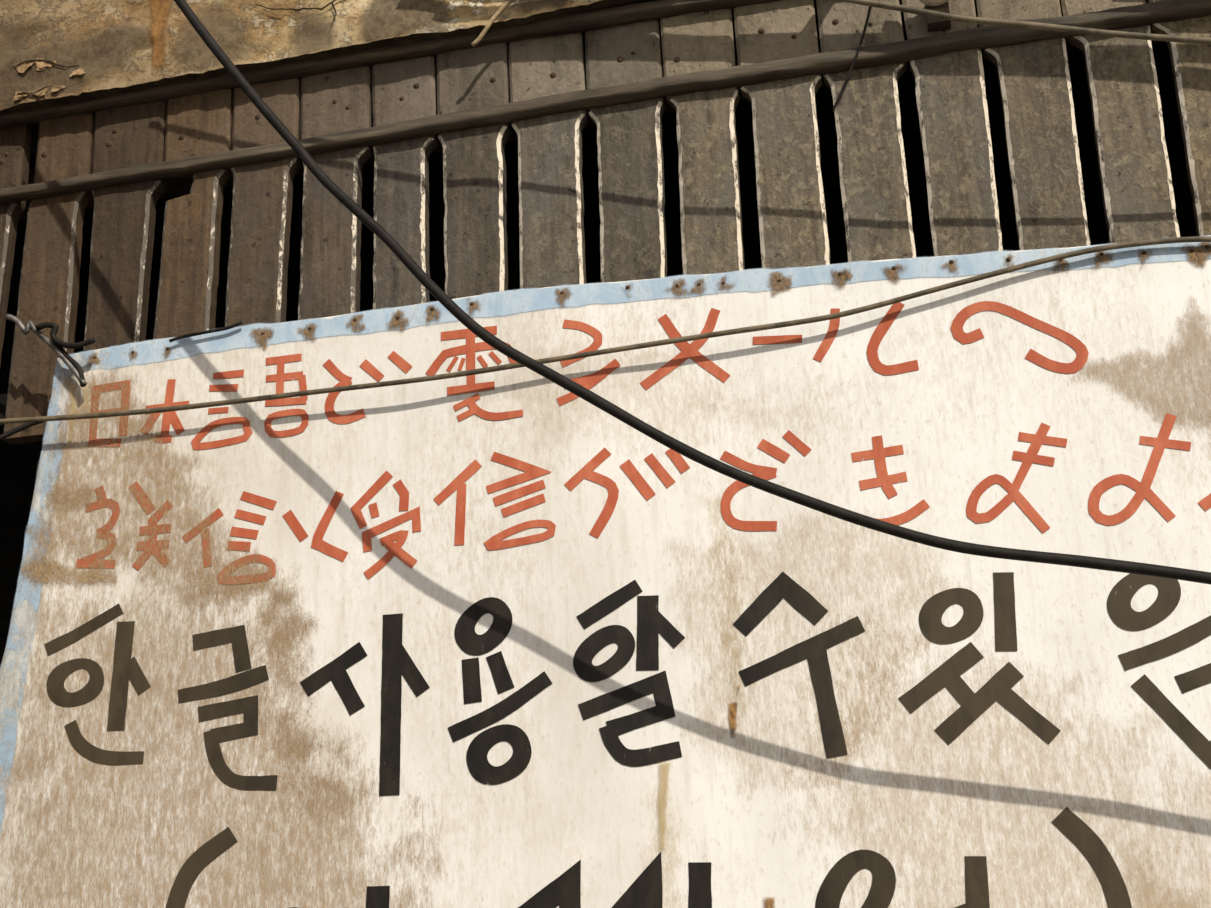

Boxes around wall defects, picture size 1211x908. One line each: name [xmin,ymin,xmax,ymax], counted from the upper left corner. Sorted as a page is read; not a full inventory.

corrosion [149,0,171,68]
crack [255,0,337,28]
water stain [362,0,447,40]
water stain [519,0,567,10]
peeling [15,58,56,73]
peeling [14,69,86,100]